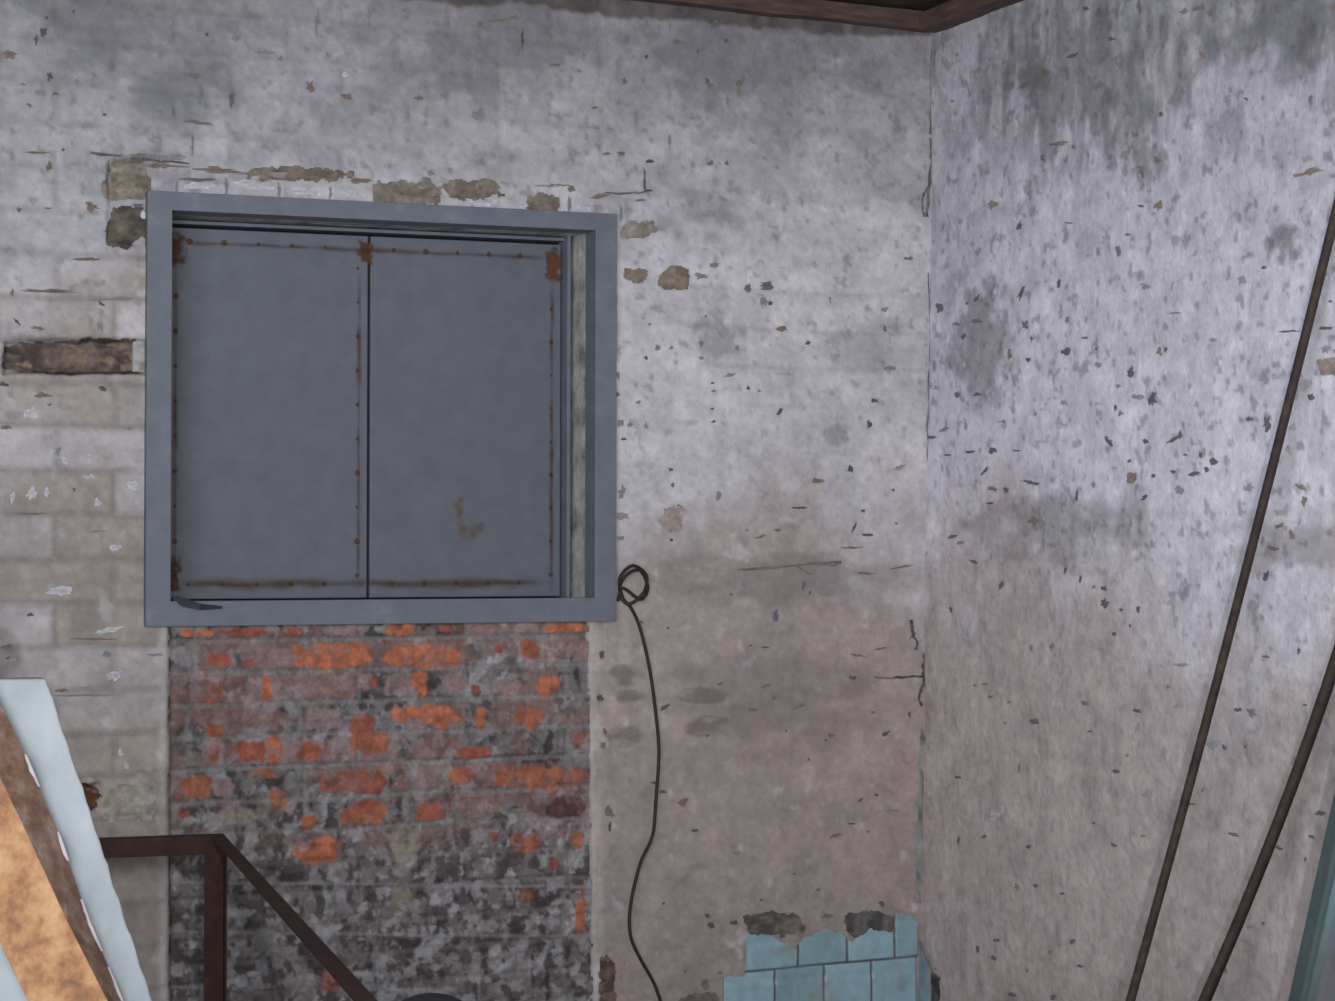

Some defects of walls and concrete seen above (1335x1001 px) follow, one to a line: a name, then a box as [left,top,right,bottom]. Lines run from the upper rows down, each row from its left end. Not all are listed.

spalling [70,73,658,261]
spalling [623,262,720,290]
spalling [0,289,141,391]
peeling [24,391,53,419]
crack [875,620,925,903]
spalling [82,783,101,810]
flaking render [149,622,617,1001]
spalling [705,899,805,942]
spalling [821,901,893,938]
spalling [678,961,723,1001]